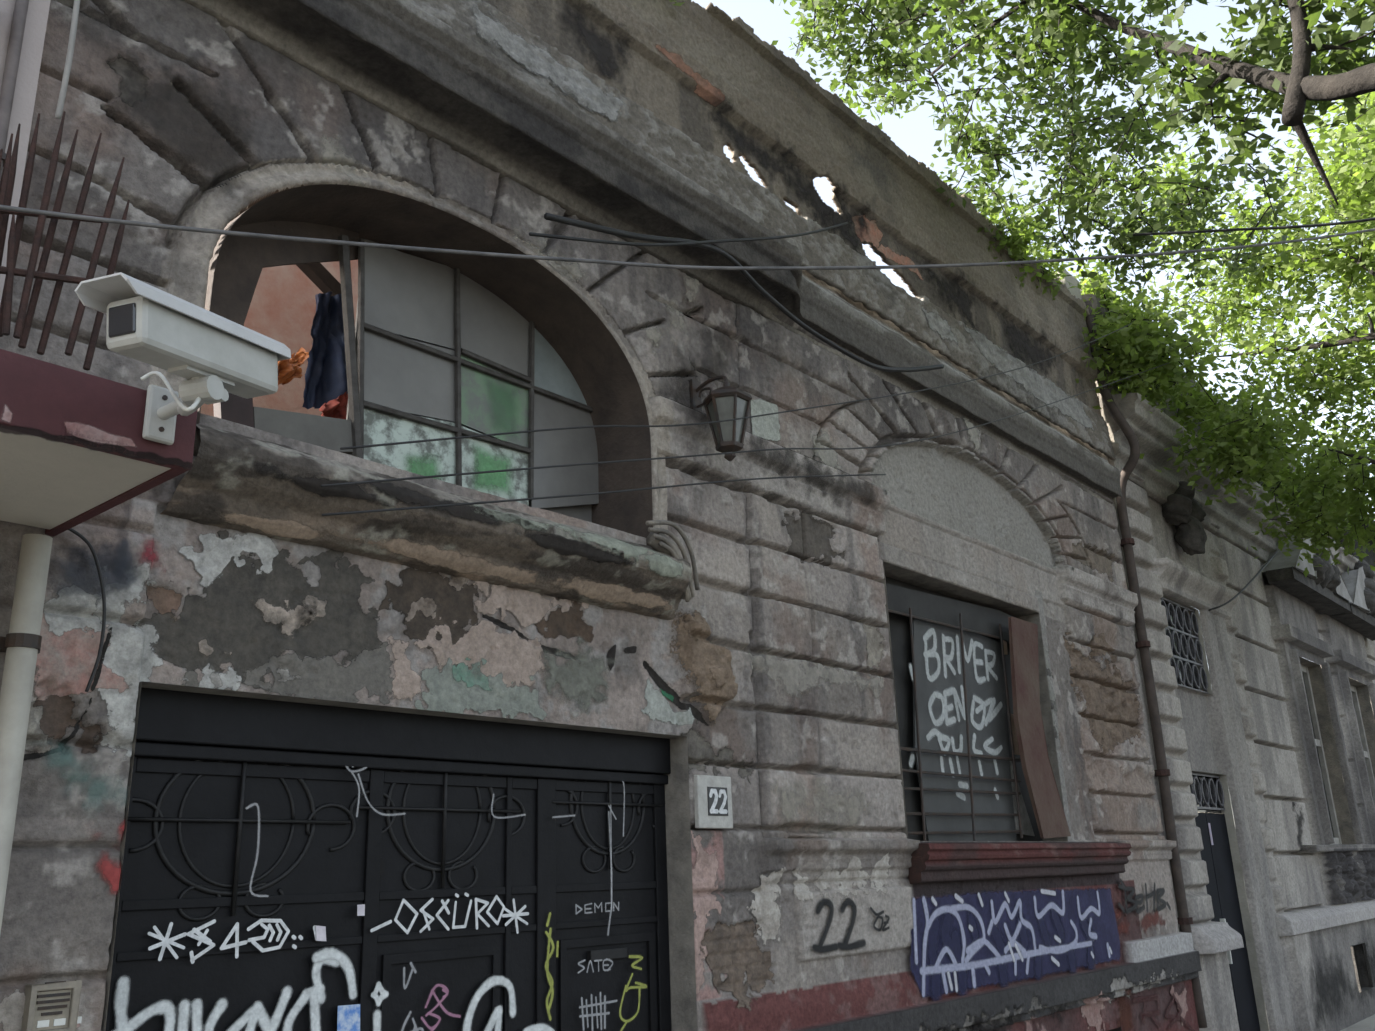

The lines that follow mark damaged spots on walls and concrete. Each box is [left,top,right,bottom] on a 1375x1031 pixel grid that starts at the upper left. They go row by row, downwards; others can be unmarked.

water stain [562,9,630,79]
water stain [711,98,867,251]
flaking render [853,215,923,280]
water stain [924,264,977,331]
water stain [993,303,1056,374]
flaking render [133,513,673,701]
peeling [25,610,129,755]
flaking render [700,851,891,1011]
peeling [0,989,25,1031]
water stain [1315,944,1375,1028]